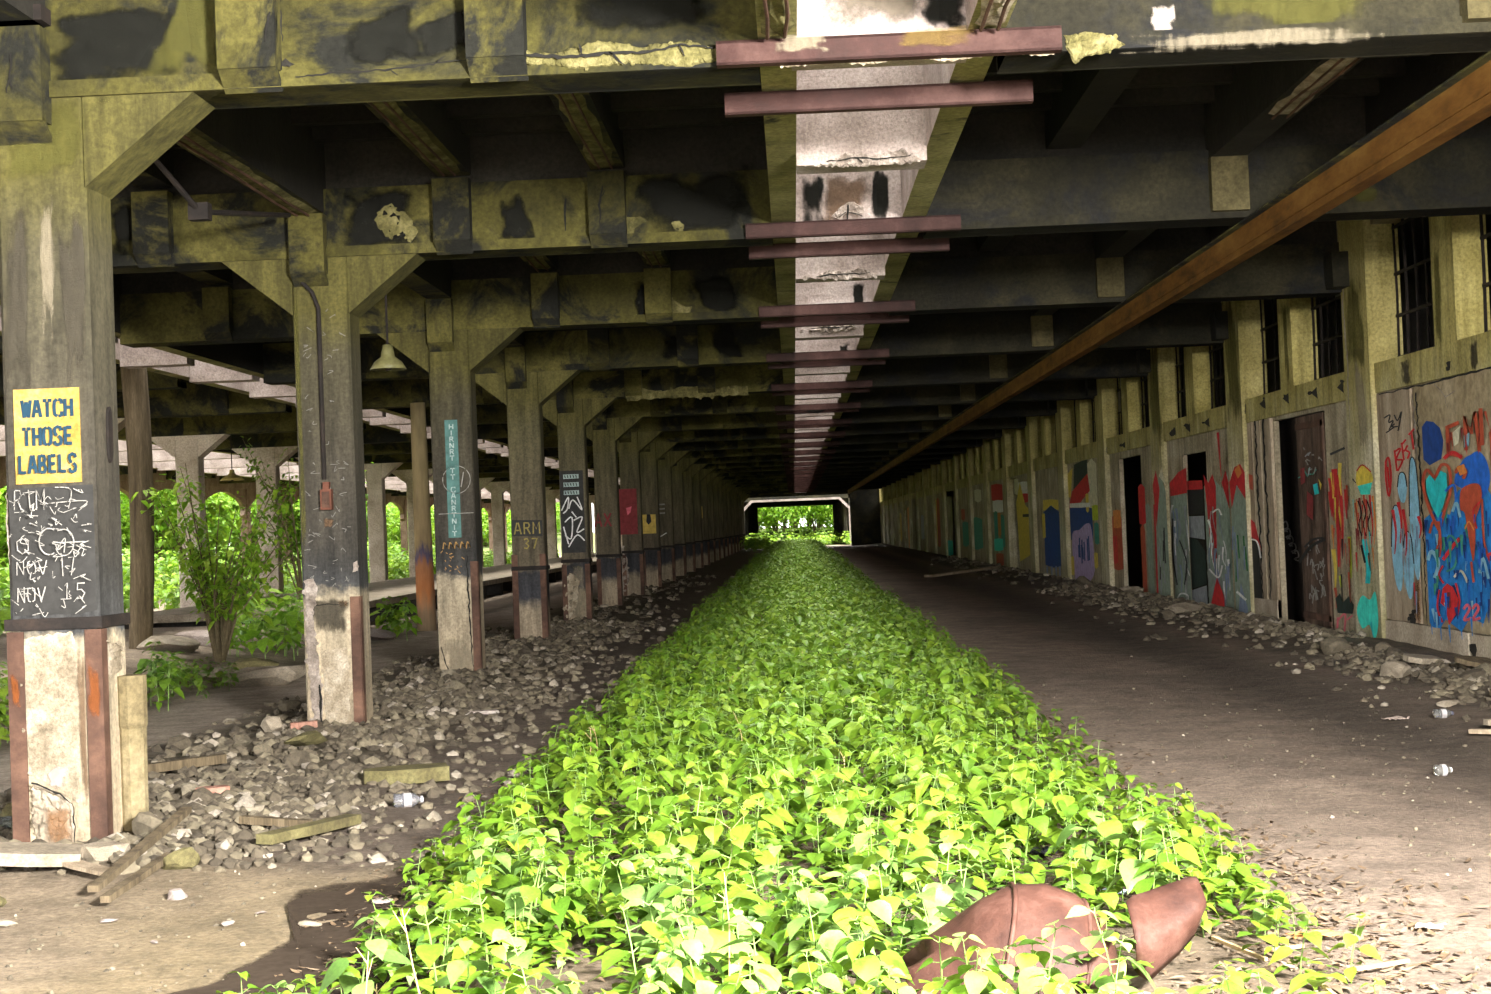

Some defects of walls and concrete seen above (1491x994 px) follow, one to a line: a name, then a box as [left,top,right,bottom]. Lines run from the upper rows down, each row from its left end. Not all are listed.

spalling [526,39,717,71]
spalling [1029,31,1125,64]
damp [803,171,889,221]
peeling [374,203,418,243]
corrosion [11,676,19,703]
corrosion [78,658,100,796]
corrosion [48,810,68,842]